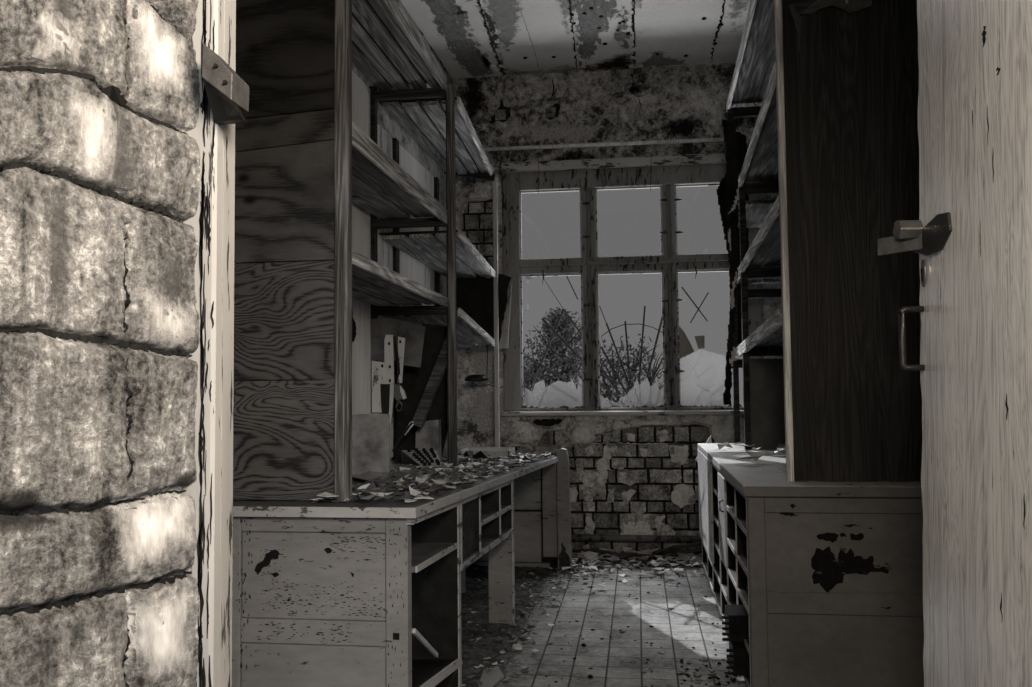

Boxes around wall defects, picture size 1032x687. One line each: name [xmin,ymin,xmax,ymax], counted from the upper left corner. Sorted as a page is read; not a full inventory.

peeling [421,0,507,77]
leakage [465,78,483,118]
crack [467,0,503,75]
leakage [555,151,598,160]
peeling [565,0,643,73]
leakage [540,52,685,72]
leakage [664,119,698,137]
crack [710,0,726,60]
flaking render [459,196,501,274]
flaking render [350,416,717,552]